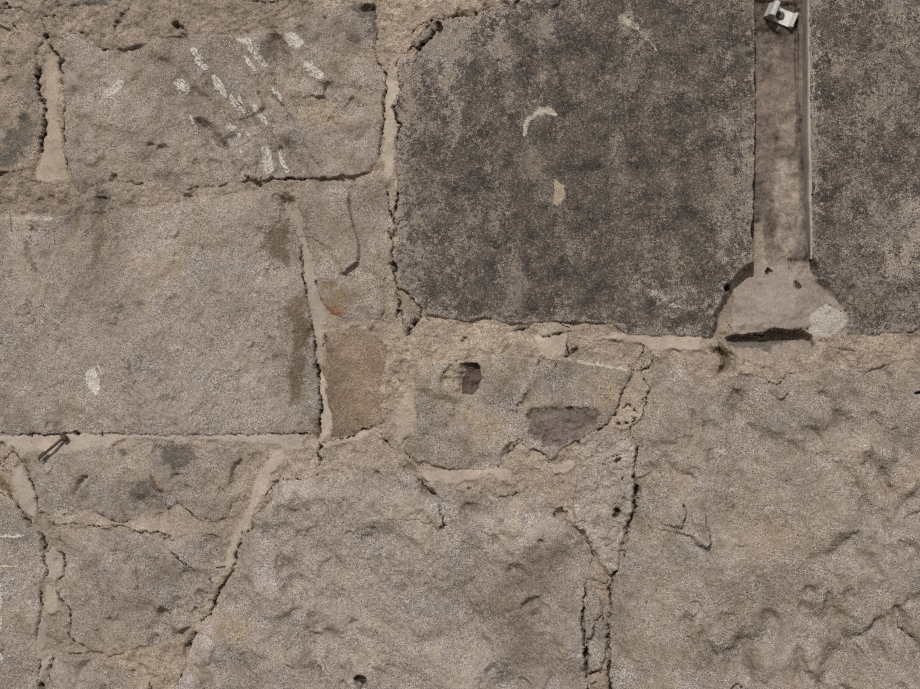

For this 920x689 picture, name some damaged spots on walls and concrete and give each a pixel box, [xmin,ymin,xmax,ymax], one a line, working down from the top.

crack [2,324,446,687]
crack [575,345,653,689]